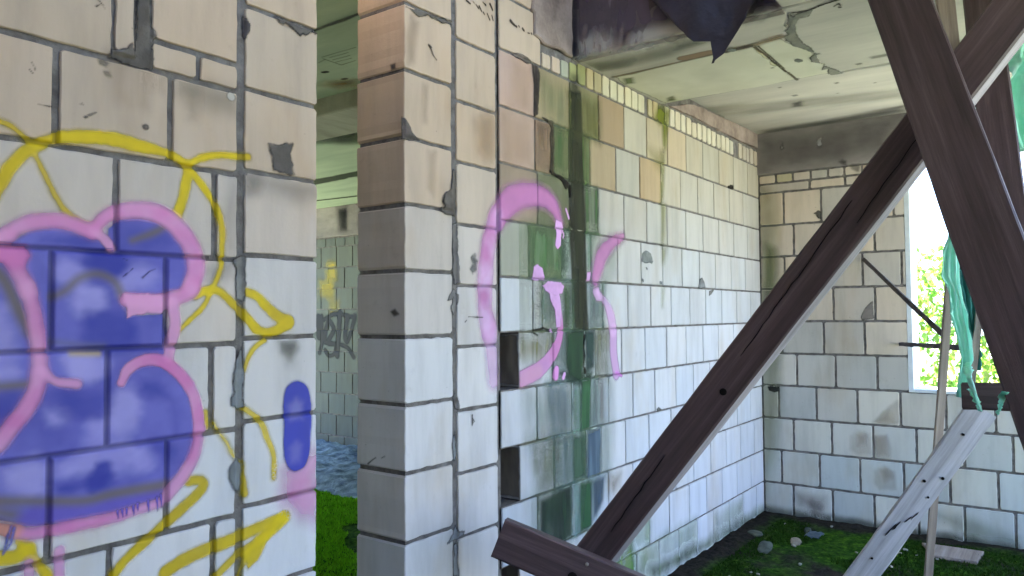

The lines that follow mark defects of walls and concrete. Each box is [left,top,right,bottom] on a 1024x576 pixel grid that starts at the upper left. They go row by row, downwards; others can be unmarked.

spalling [242,17,250,39]
spalling [274,16,317,36]
flaking render [784,9,841,75]
crack [753,46,798,81]
leakage [656,97,675,147]
leakage [521,89,615,541]
spalling [861,302,874,320]